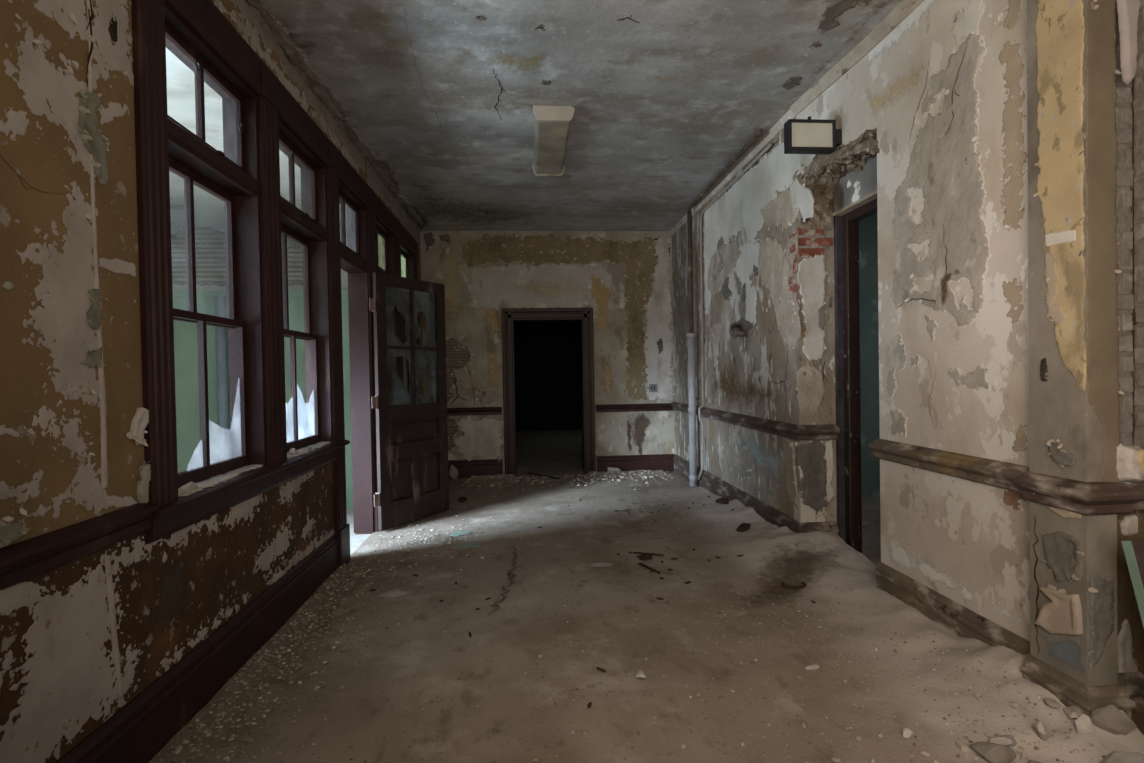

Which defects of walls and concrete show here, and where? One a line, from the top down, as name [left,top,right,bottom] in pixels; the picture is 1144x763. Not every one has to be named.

flaking render [809,0,872,50]
peeling [214,0,674,403]
peeling [0,0,151,548]
peeling [703,130,880,417]
peeling [0,493,263,763]
peeling [253,470,334,586]
crack [489,545,518,614]
flaking render [782,437,834,510]
peeling [1034,531,1085,635]
peeling [1117,619,1139,673]
peeling [1120,515,1138,536]